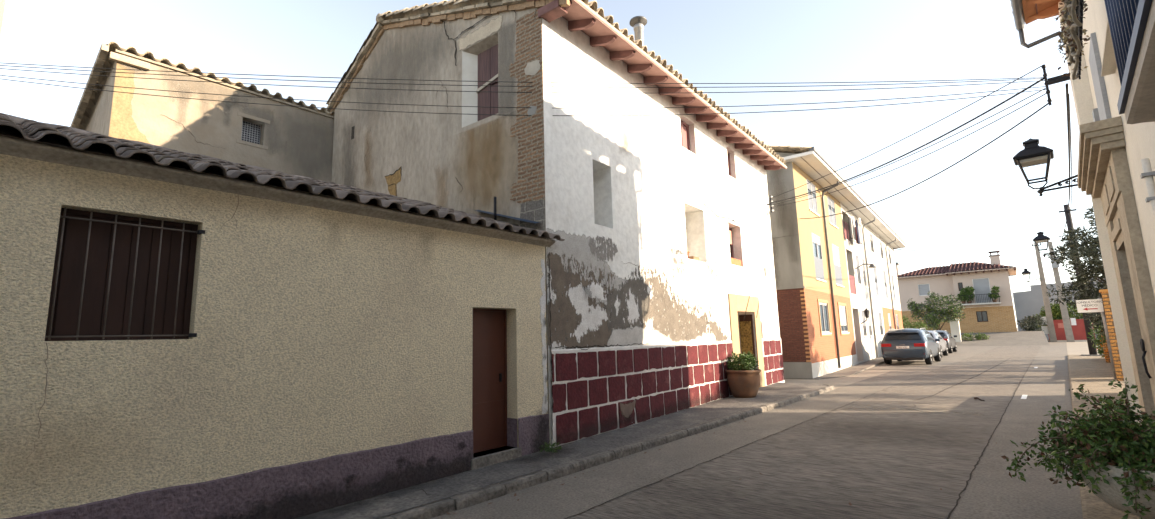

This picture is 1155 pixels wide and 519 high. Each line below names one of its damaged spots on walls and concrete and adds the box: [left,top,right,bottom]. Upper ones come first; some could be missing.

crack [436,10,536,112]
spalling [385,167,402,196]
peeling [540,236,727,414]
crack [26,342,48,459]